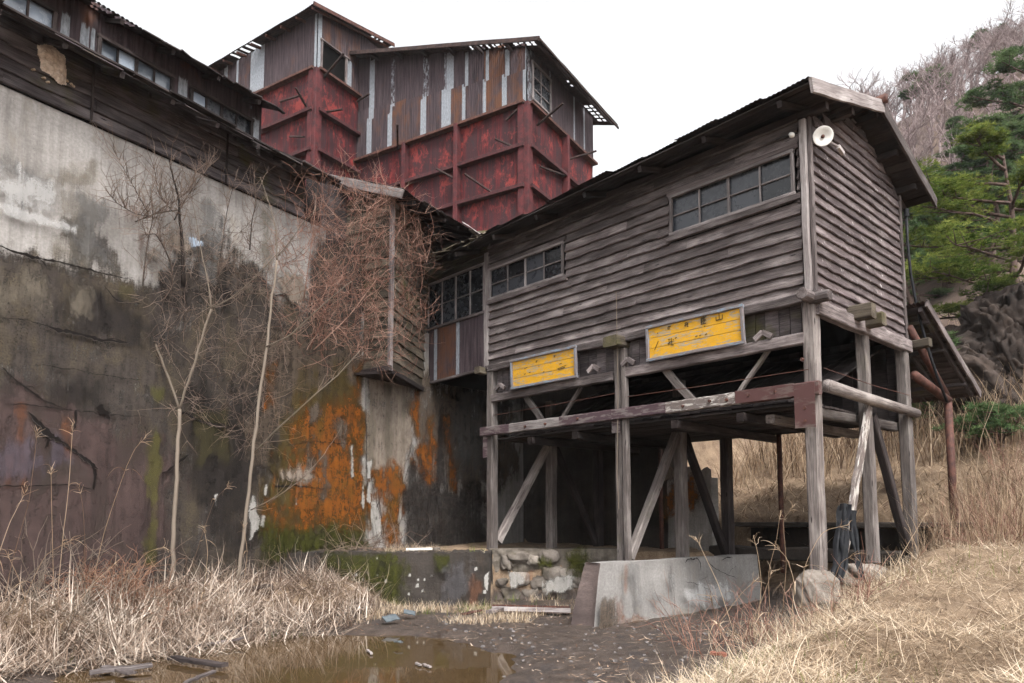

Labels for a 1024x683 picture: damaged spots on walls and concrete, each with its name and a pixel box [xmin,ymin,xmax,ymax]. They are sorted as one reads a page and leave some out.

crack [0,245,140,344]
crack [2,367,98,489]
damp [0,196,525,607]
peeling [248,484,268,540]